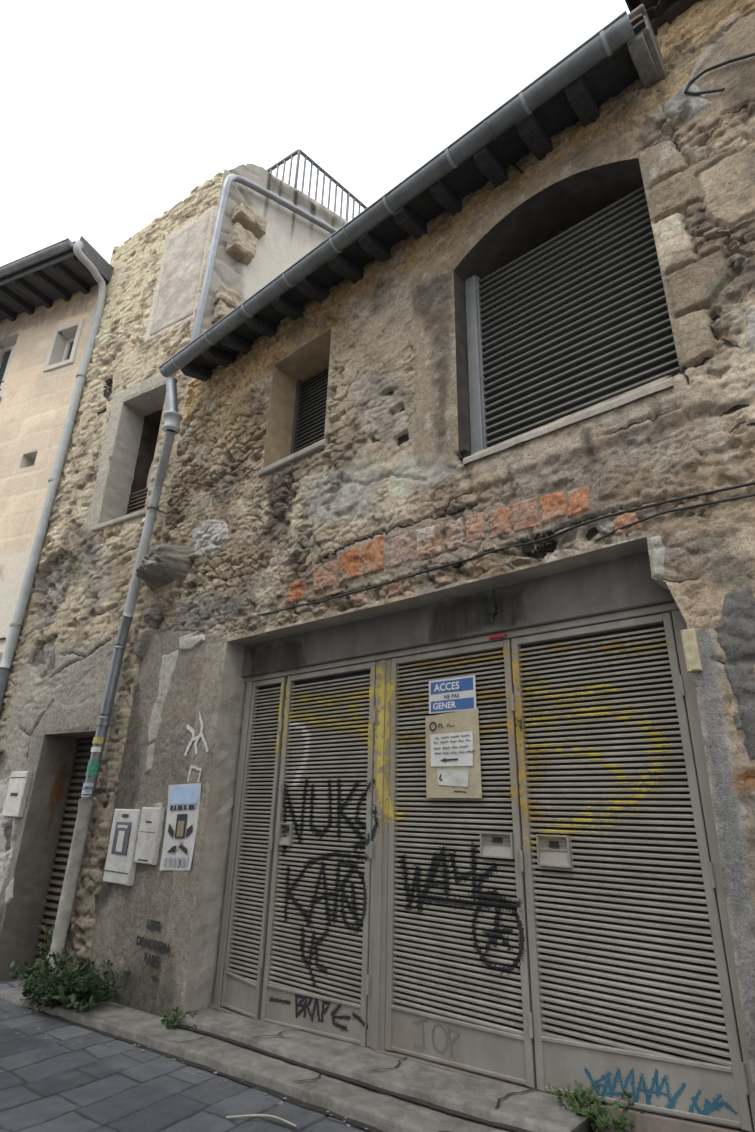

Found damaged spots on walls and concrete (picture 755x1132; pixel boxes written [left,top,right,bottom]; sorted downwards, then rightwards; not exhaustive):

crack [607,319,741,435]
peeling [0,776,18,905]